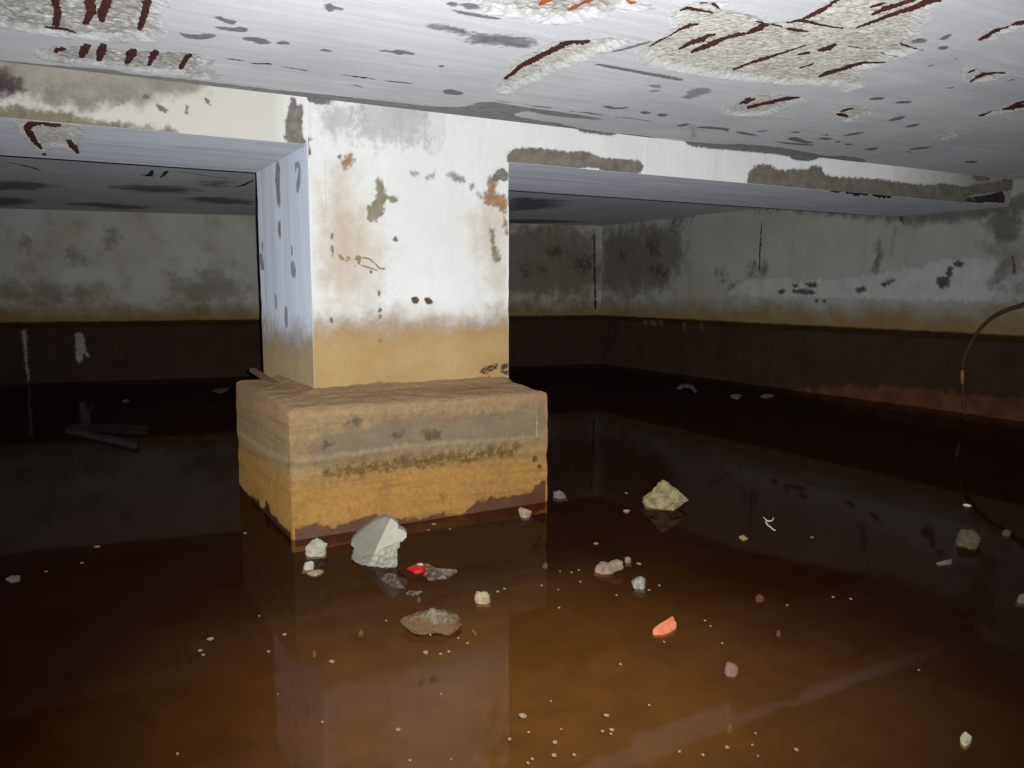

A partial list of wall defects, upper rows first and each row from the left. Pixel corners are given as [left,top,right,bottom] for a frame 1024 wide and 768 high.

spalling [0,0,1014,203]
corrosion [484,177,508,234]
leakage [870,179,1024,267]
leakage [778,282,826,302]
leakage [936,261,963,288]
leakage [0,305,1024,403]